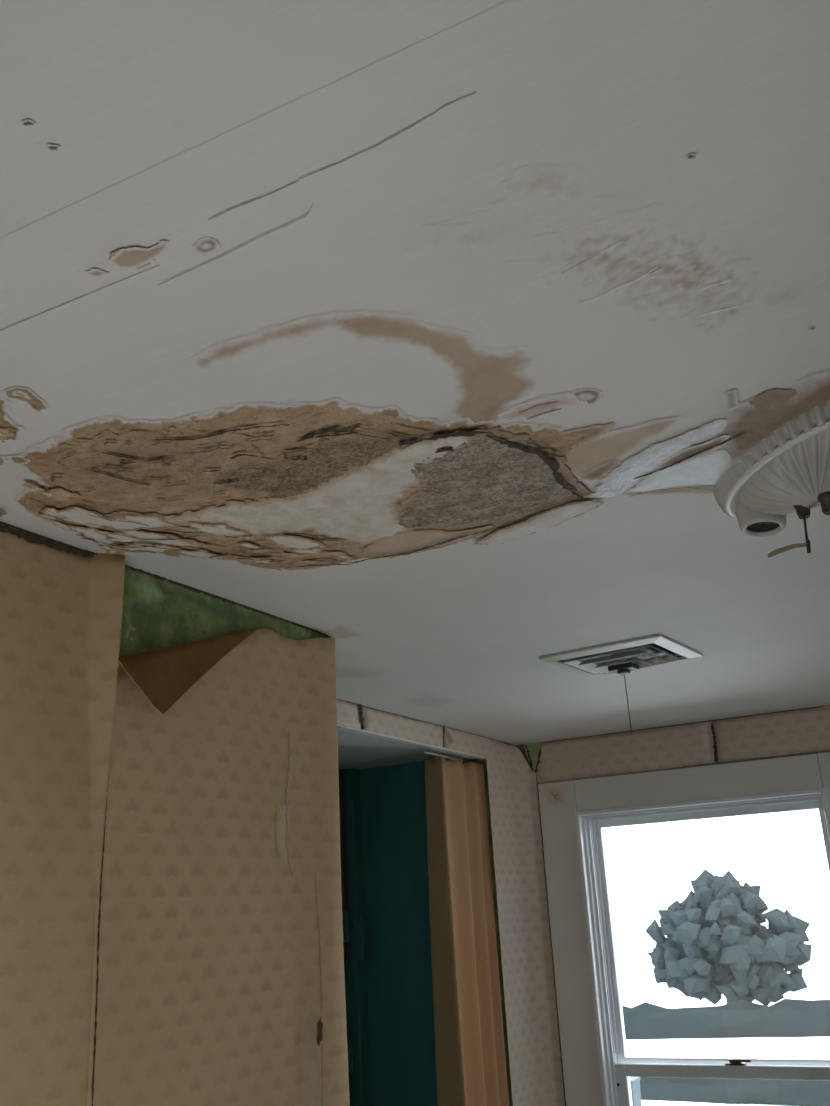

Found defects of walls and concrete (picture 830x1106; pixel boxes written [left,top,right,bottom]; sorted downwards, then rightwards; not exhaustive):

crack [0,92,476,331]
leakage [188,309,542,426]
peeling [0,386,744,657]
leakage [709,370,830,467]